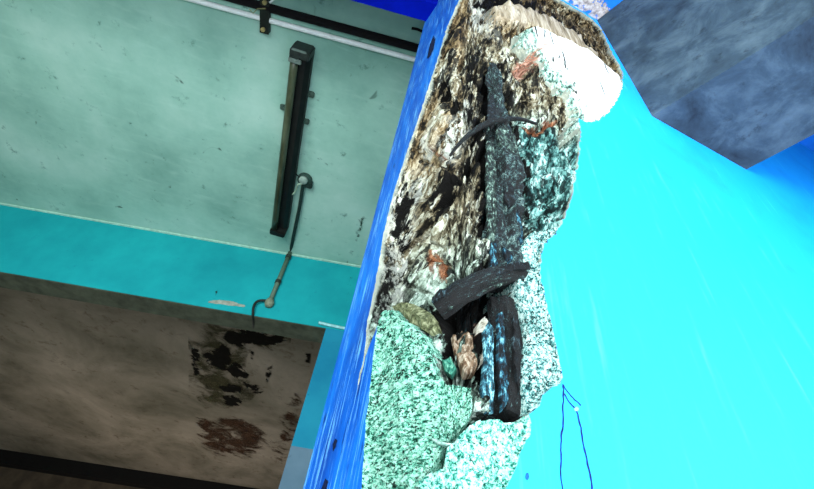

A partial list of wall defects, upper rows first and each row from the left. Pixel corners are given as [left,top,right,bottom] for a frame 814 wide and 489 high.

spalling [357,0,624,489]
water stain [188,324,291,407]
crack [560,384,593,489]